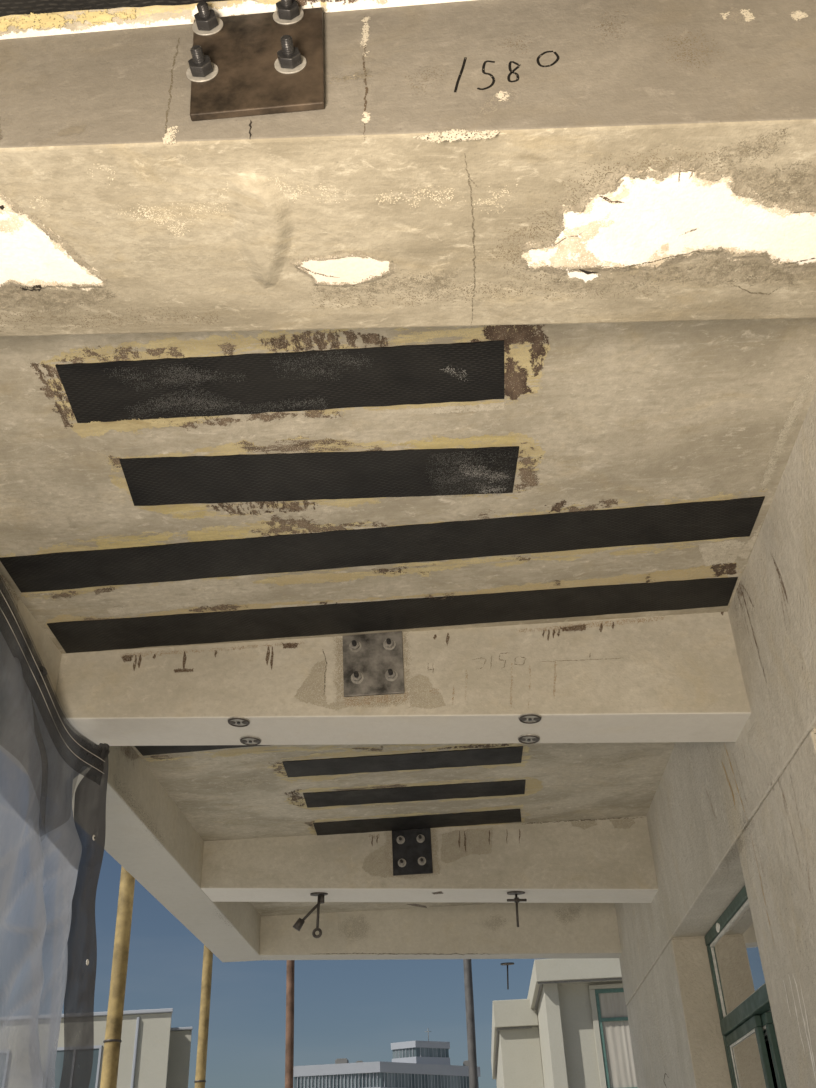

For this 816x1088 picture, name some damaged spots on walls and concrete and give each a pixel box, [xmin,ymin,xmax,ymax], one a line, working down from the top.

leakage [0,0,280,34]
leakage [297,0,357,8]
peeling [0,188,118,314]
peeling [288,250,460,298]
crack [464,153,476,327]
peeling [518,128,816,295]